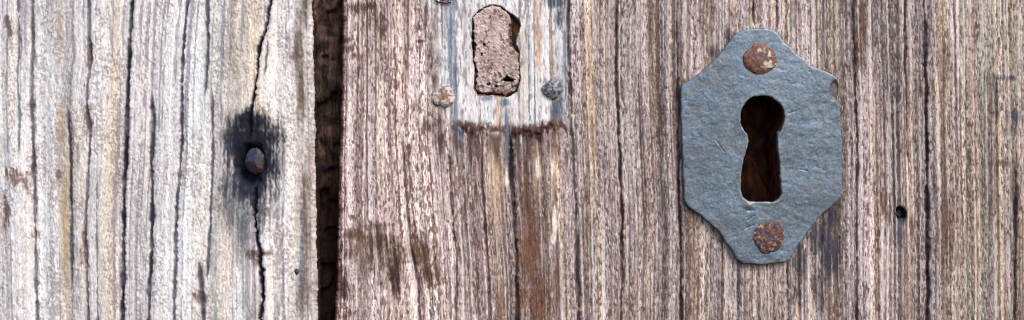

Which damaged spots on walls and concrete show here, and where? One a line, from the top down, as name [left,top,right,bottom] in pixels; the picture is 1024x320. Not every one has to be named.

crack [249,0,272,135]
water stain [223,107,285,266]
crack [254,188,265,320]